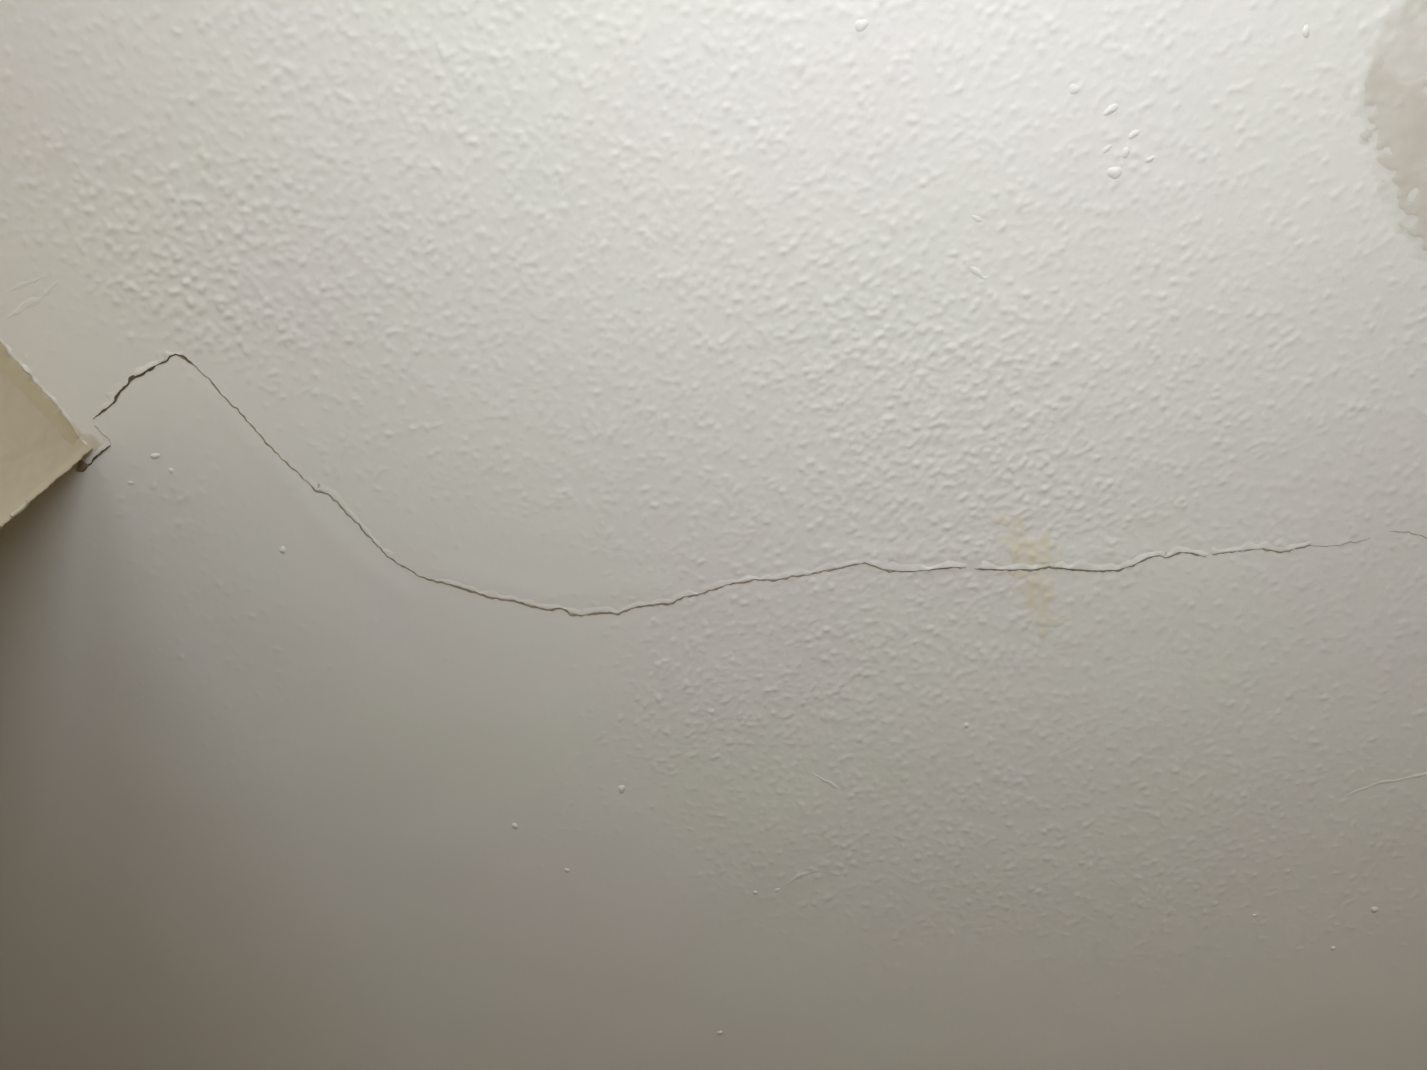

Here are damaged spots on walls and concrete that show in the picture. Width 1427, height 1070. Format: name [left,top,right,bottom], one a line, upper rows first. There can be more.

damp [1340,0,1427,262]
crack [81,351,1427,617]